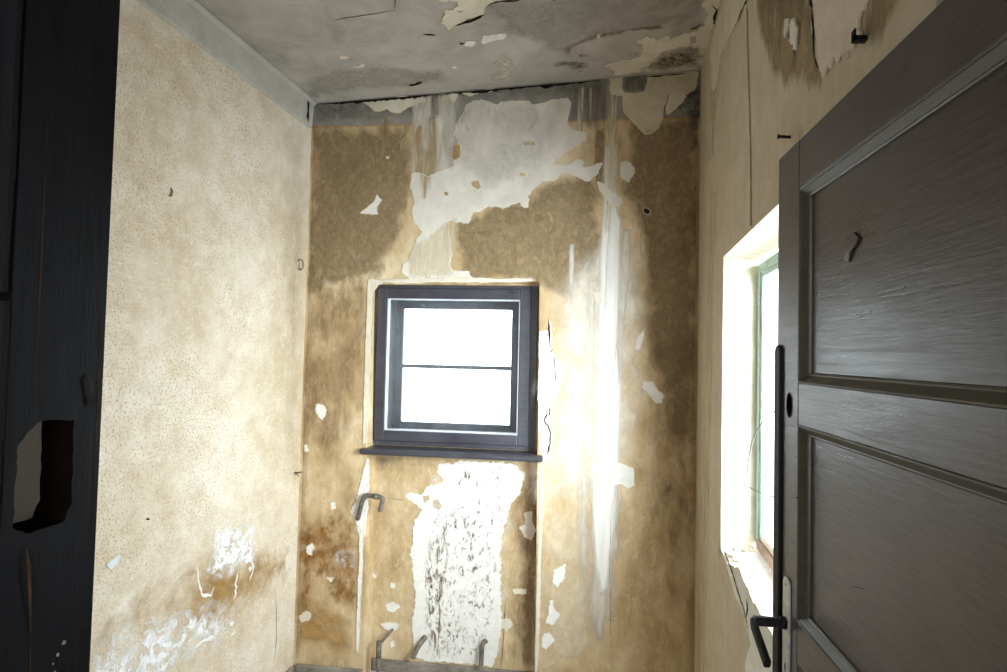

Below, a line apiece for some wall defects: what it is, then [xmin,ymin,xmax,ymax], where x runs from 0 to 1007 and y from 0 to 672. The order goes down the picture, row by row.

peeling [439,0,529,31]
peeling [464,33,507,47]
peeling [602,0,749,159]
peeling [809,0,869,79]
water stain [307,93,458,445]
peeling [360,97,603,444]
water stain [458,88,715,672]
water stain [94,526,254,672]
peeling [379,602,400,648]
water stain [427,504,493,656]
peeling [405,460,525,668]
flaking render [513,330,566,672]